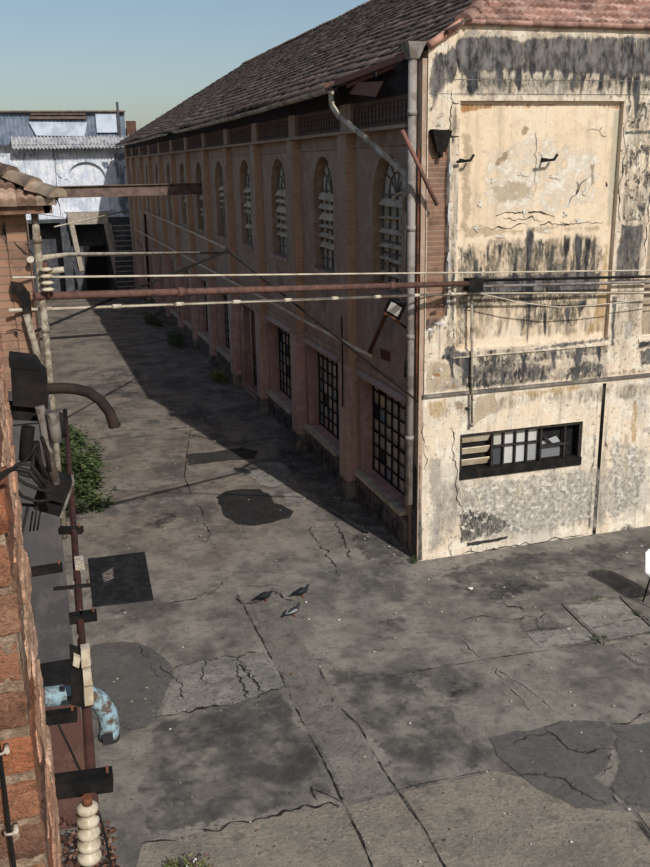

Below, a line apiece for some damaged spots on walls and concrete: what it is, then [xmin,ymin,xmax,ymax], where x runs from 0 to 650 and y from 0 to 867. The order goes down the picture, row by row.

flaking render [478,134,598,223]
leakage [426,29,650,397]
crack [491,105,628,230]